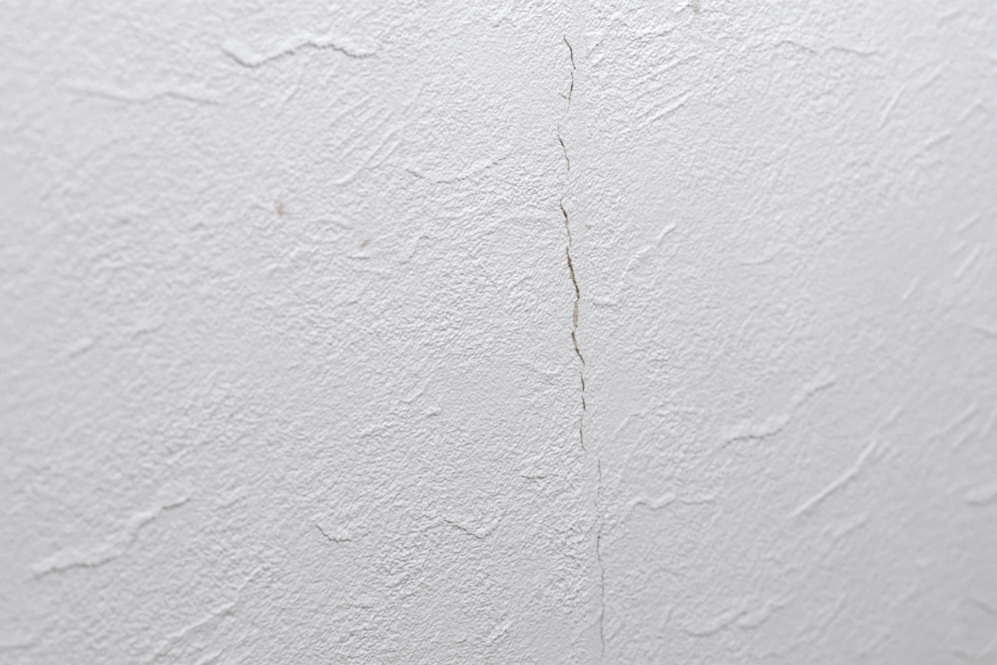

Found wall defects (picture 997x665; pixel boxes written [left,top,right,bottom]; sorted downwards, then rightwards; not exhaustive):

crack [558,36,604,653]